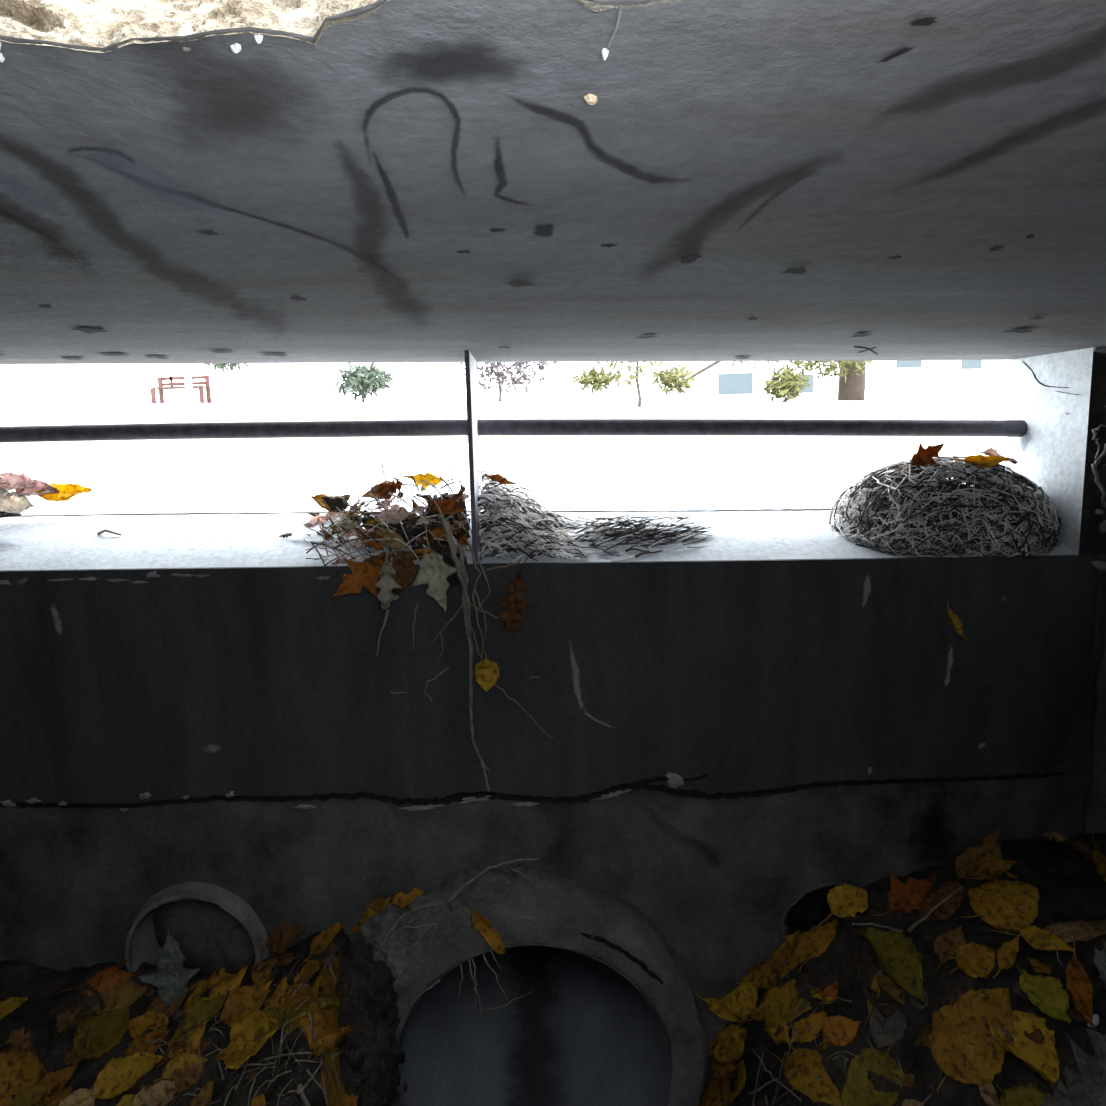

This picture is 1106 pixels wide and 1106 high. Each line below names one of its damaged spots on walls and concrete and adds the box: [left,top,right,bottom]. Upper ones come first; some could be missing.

spalling [0,0,389,53]
spalling [573,0,685,13]
damp [903,31,1106,109]
damp [68,48,511,312]
damp [494,142,525,204]
damp [516,100,677,183]
damp [938,100,1106,176]
damp [0,141,243,309]
crack [0,772,1066,812]
crack [581,932,663,985]